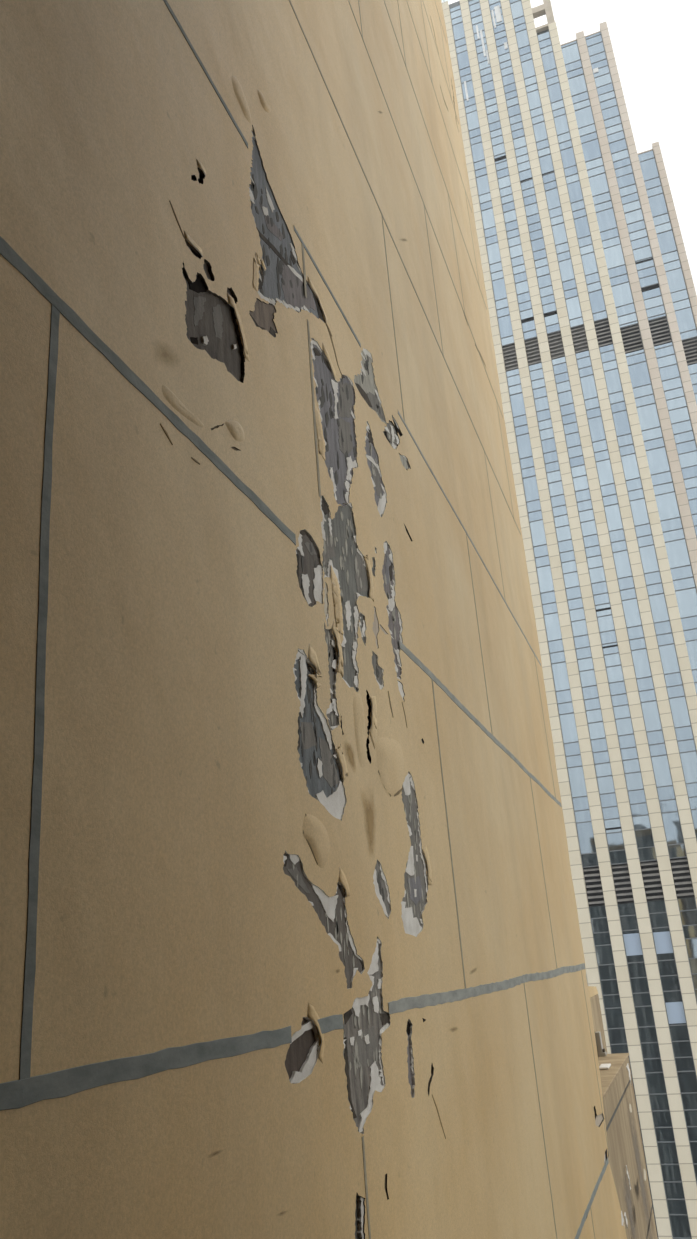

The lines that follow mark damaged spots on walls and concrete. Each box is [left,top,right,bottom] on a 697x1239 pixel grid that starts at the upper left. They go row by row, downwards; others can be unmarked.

peeling [182,125,327,383]
peeling [293,338,411,821]
peeling [373,772,432,937]
peeling [283,851,390,1134]
spalling [355,1193,365,1239]